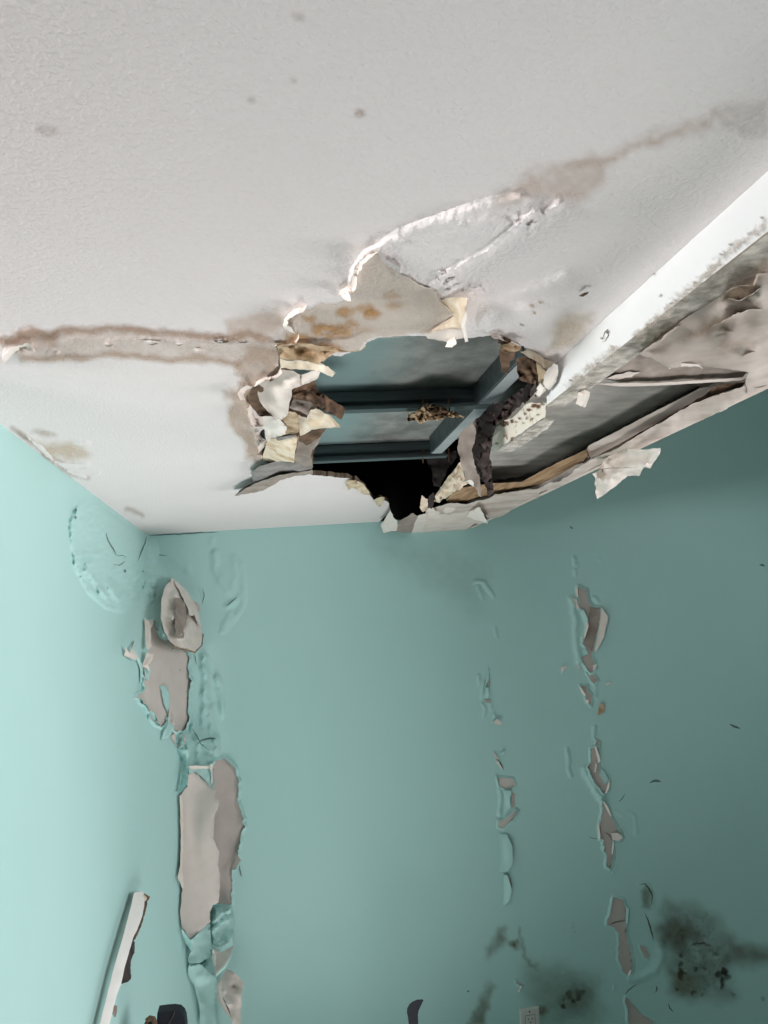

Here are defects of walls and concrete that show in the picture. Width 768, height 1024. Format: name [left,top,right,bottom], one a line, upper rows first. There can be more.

peeling [635,217,764,336]
leakage [0,327,279,454]
spalling [312,439,467,521]
peeling [593,448,661,499]
peeling [561,553,641,876]
peeling [124,617,248,1024]
peeling [493,752,520,906]
peeling [604,880,668,1024]
leakage [676,962,729,990]